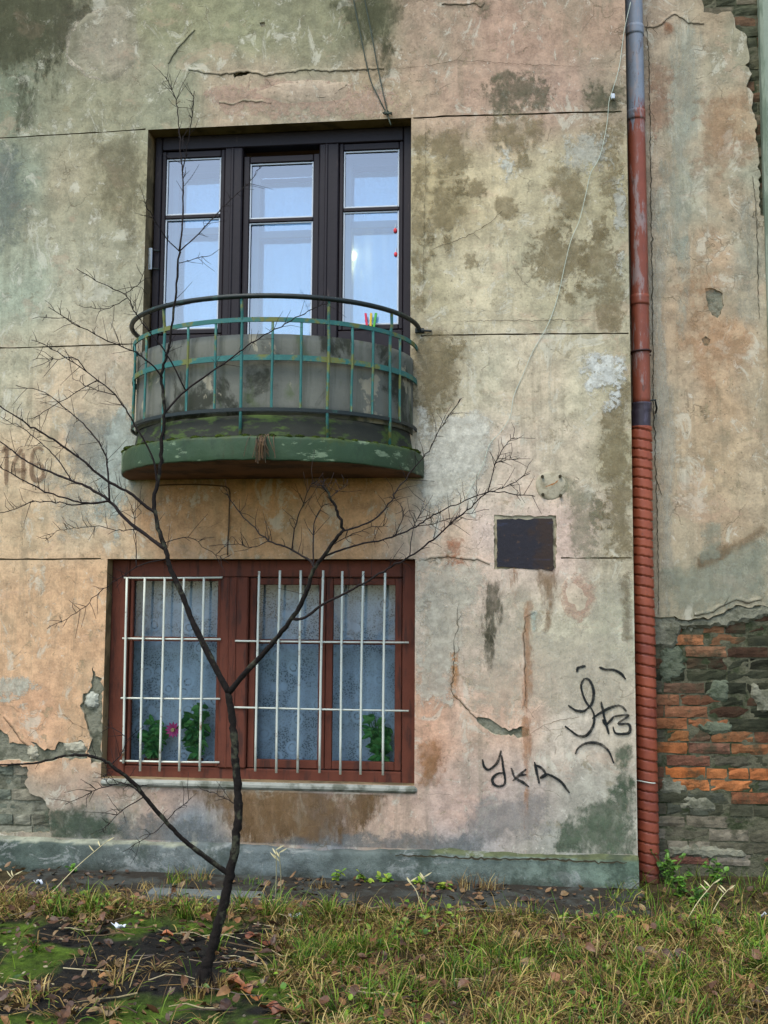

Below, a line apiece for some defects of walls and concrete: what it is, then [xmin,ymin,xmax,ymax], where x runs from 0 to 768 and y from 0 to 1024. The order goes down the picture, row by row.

crack [167,29,384,105]
crack [645,11,704,614]
flaking render [705,288,724,318]
peeling [563,351,633,559]
crack [451,604,479,719]
leakage [481,582,503,662]
flaking render [0,668,105,834]
leakage [193,790,479,851]
leakage [615,745,634,794]
flaking render [653,605,768,877]